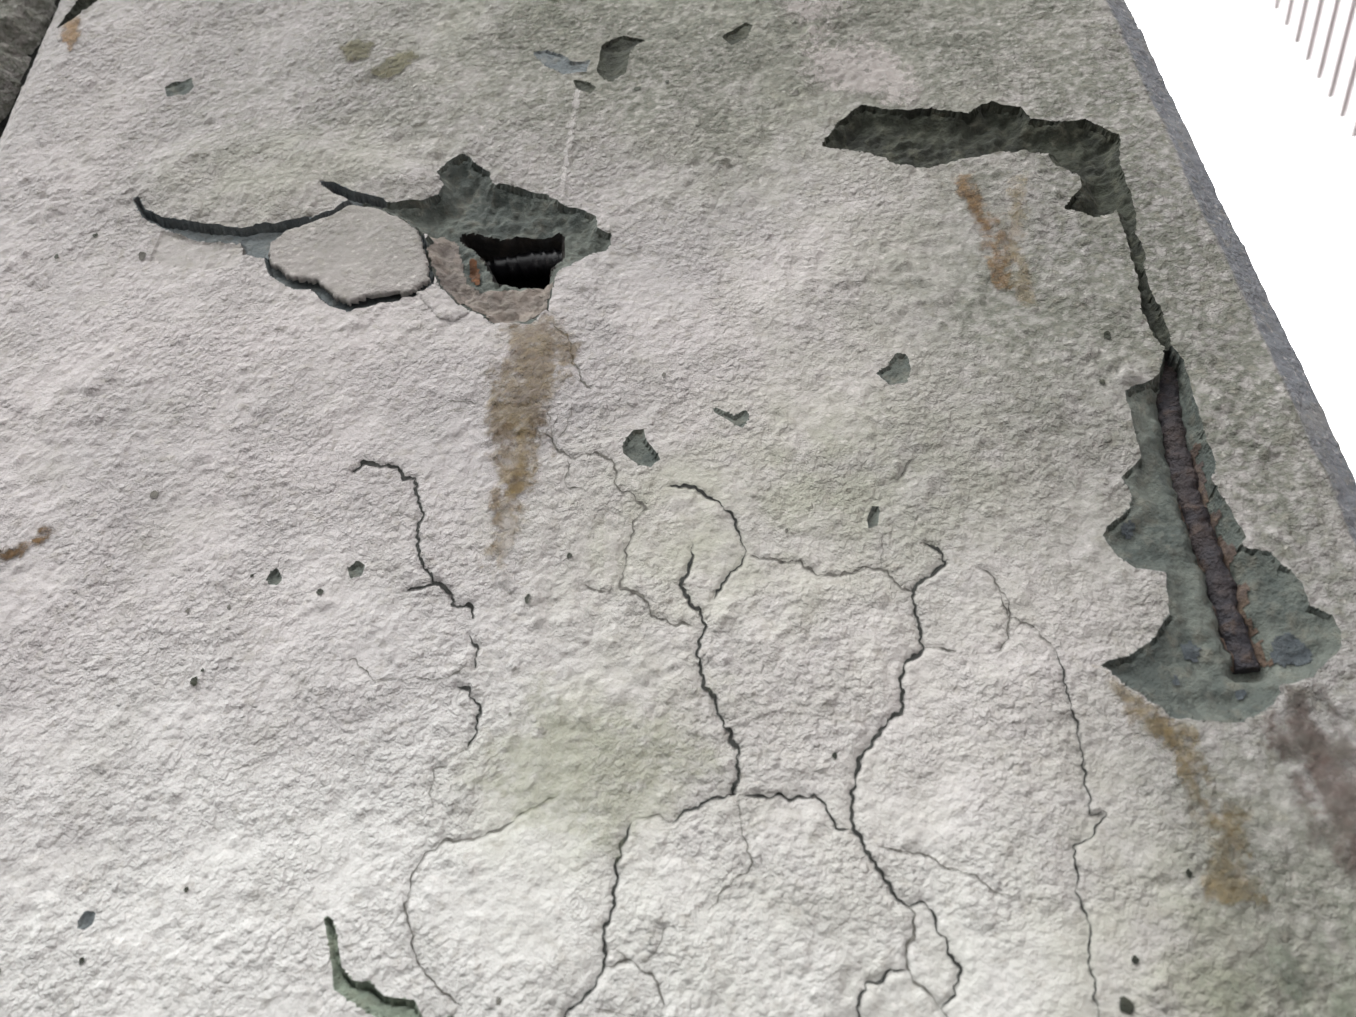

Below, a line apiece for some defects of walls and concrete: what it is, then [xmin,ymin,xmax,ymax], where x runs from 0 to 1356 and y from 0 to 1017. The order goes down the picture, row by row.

spalling [56,0,97,28]
spalling [534,36,645,93]
spalling [133,154,612,324]
spalling [822,100,1342,724]
rust [0,526,51,560]
crack [348,459,557,1005]
crack [535,326,1012,1017]
crack [980,568,1108,1017]
peeling [324,916,422,1017]